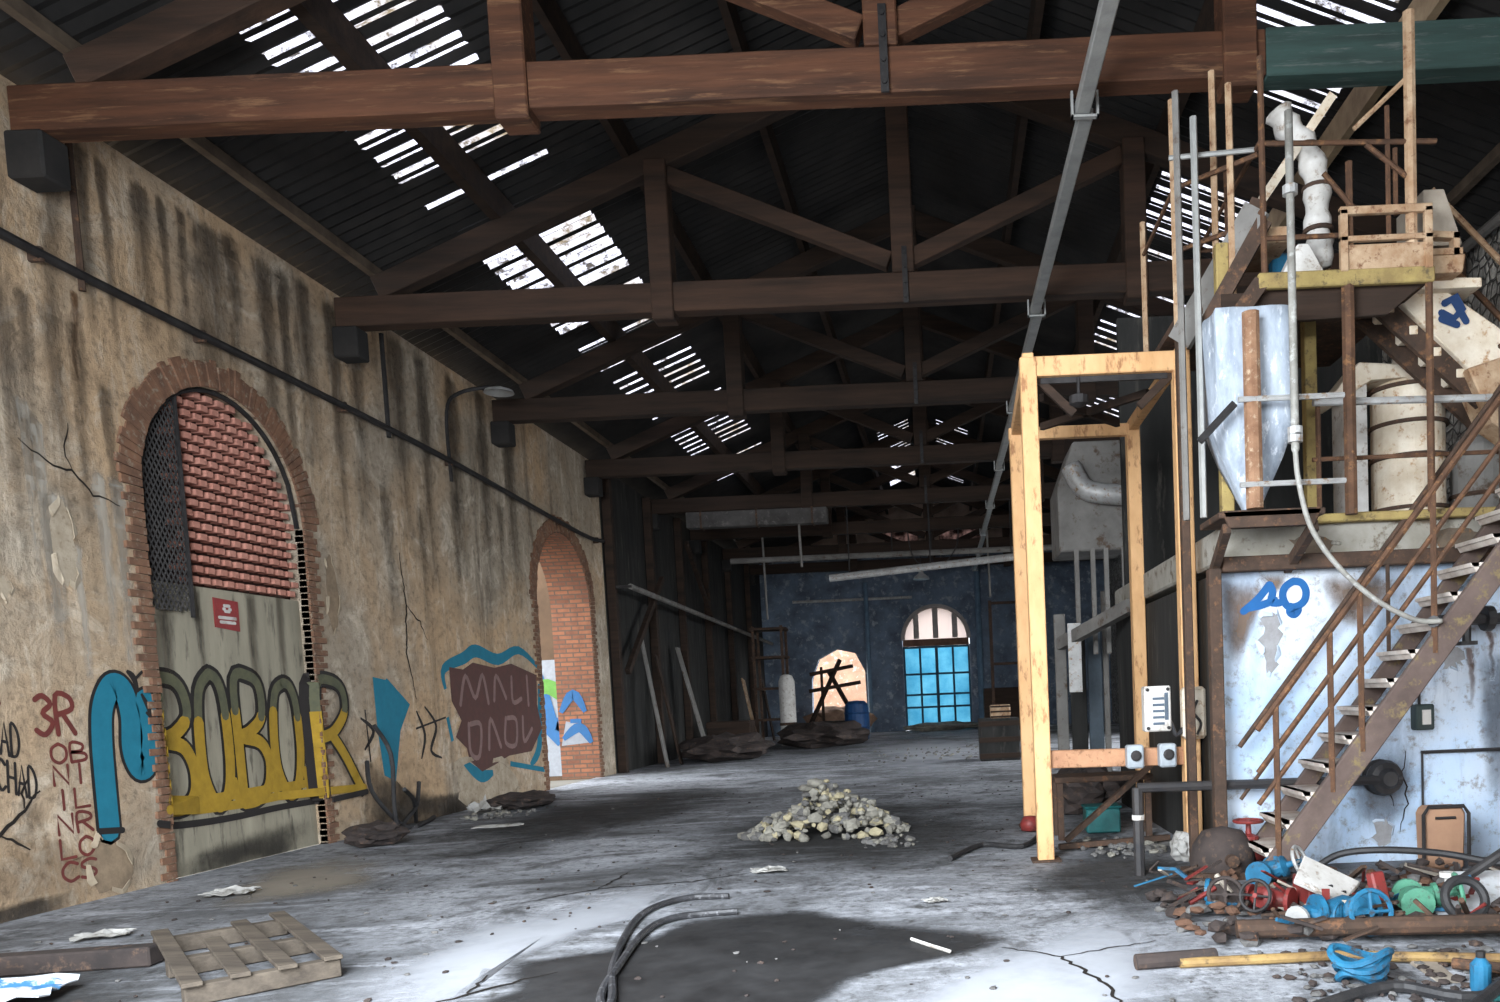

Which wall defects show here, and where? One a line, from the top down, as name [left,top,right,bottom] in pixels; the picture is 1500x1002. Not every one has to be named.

water stain [73,145,109,239]
water stain [132,184,236,288]
water stain [256,261,361,432]
water stain [1227,577,1282,650]
rust [1465,631,1494,682]